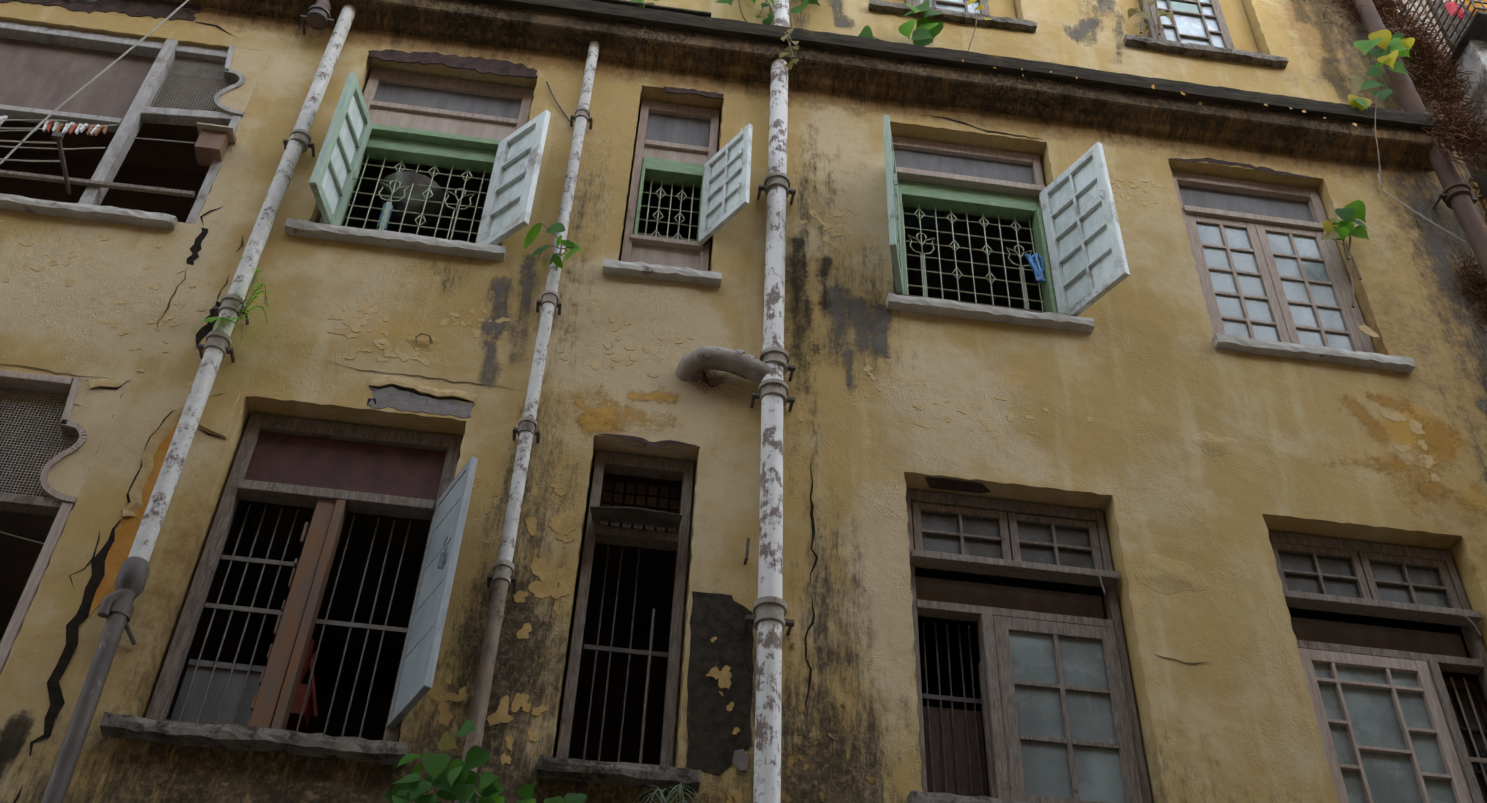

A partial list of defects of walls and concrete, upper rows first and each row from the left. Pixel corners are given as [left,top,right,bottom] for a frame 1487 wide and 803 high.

water stain [1065,0,1124,54]
crack [157,205,244,328]
water stain [784,237,891,394]
flaking render [367,386,475,418]
peeling [1379,409,1440,483]
crack [804,456,820,713]
peeling [706,665,740,735]